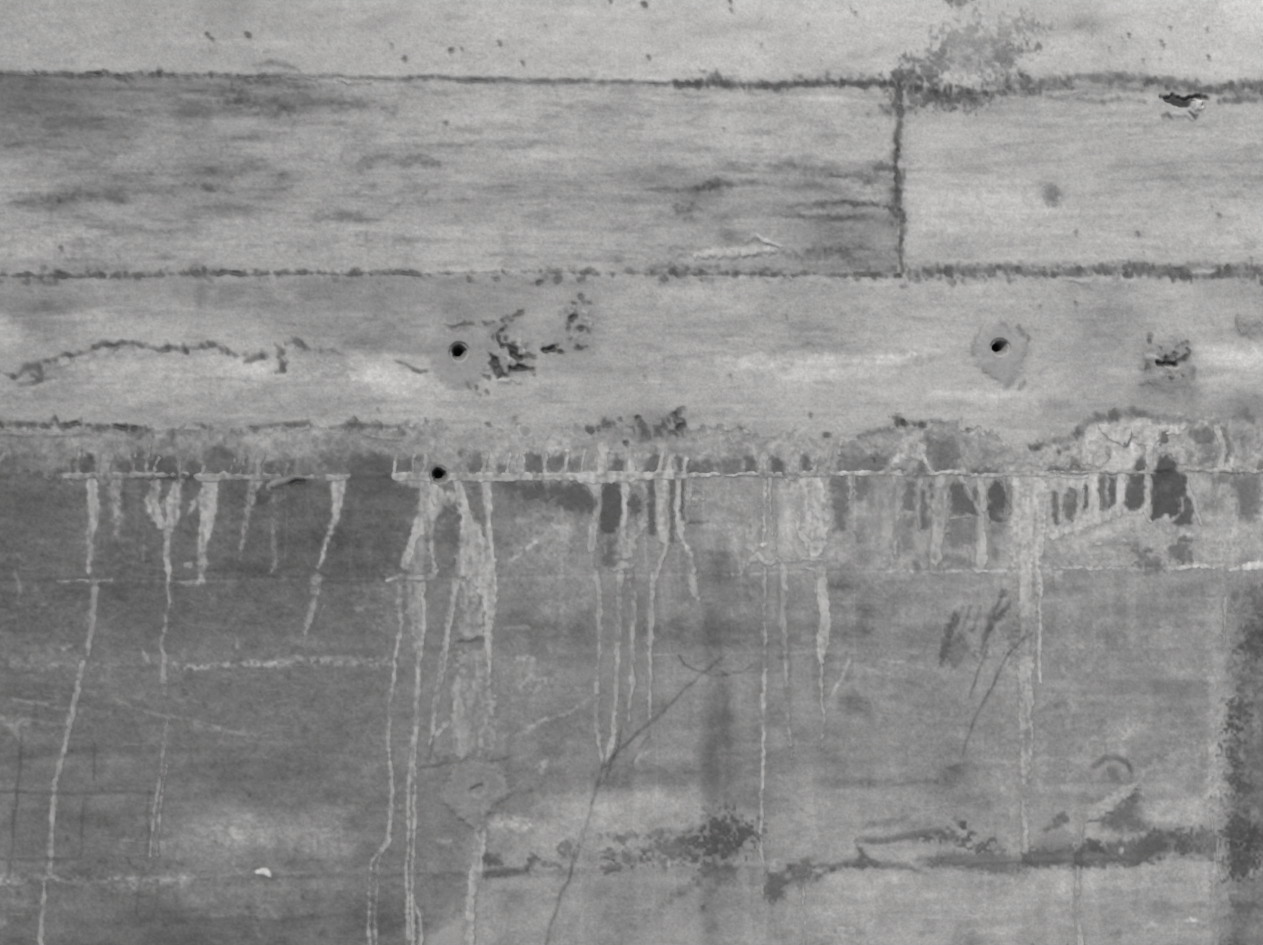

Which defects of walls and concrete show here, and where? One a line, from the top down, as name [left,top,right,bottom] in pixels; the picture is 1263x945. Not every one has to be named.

spalling [1159,94,1207,118]
spalling [449,294,591,393]
spalling [1145,335,1191,383]
damp [37,422,1263,945]